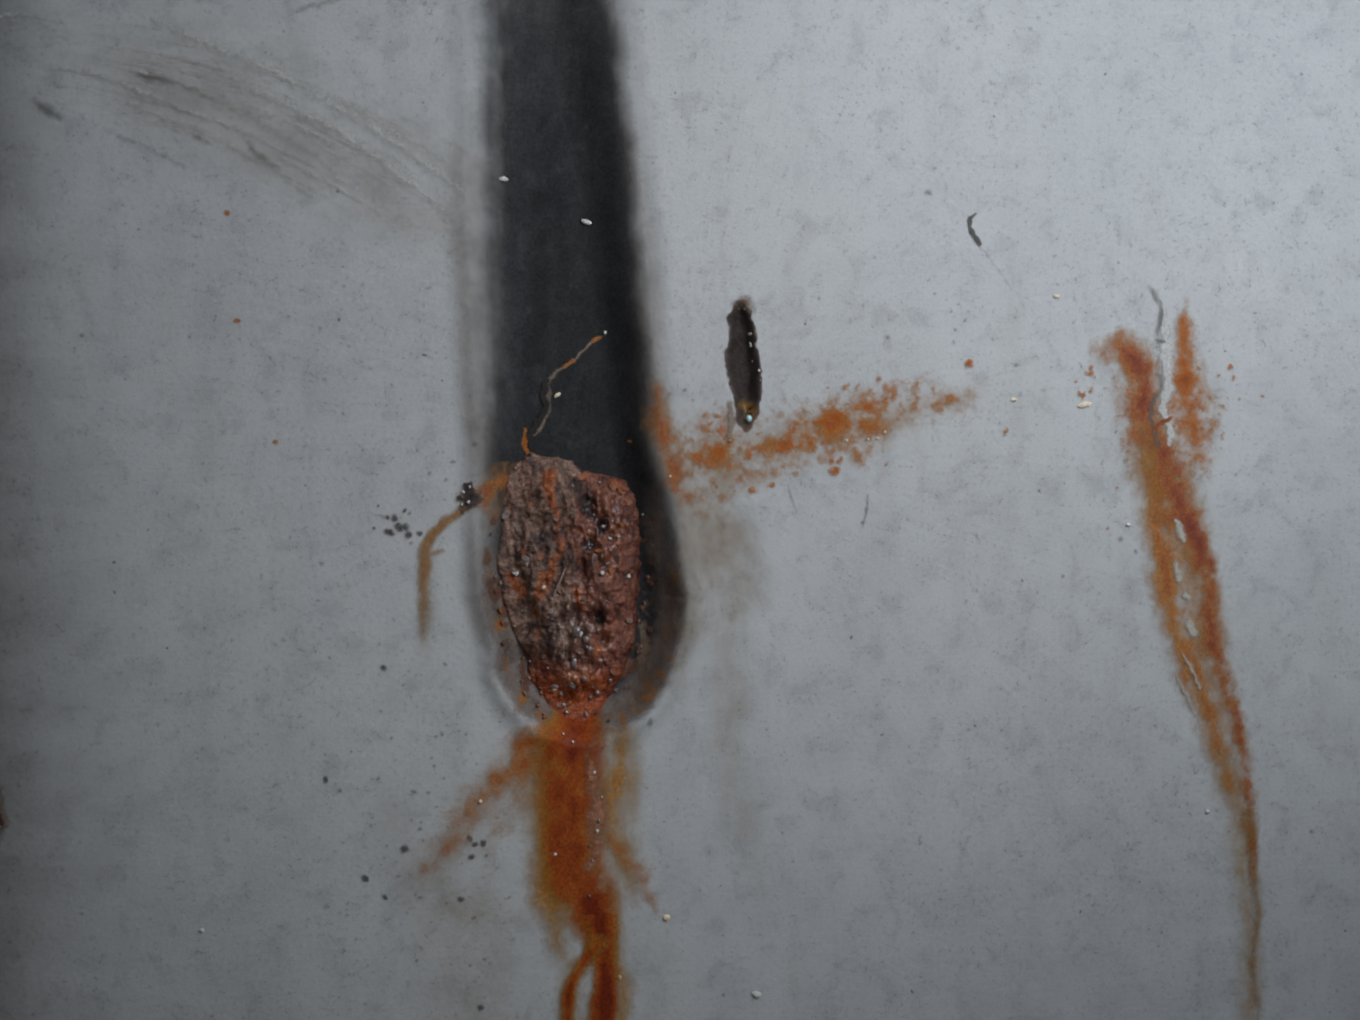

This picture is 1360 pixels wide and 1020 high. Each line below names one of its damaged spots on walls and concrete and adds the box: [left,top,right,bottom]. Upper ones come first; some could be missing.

rust [419,451,654,1020]
damp [472,0,688,736]
rust [648,377,897,502]
rust [1075,314,1262,975]